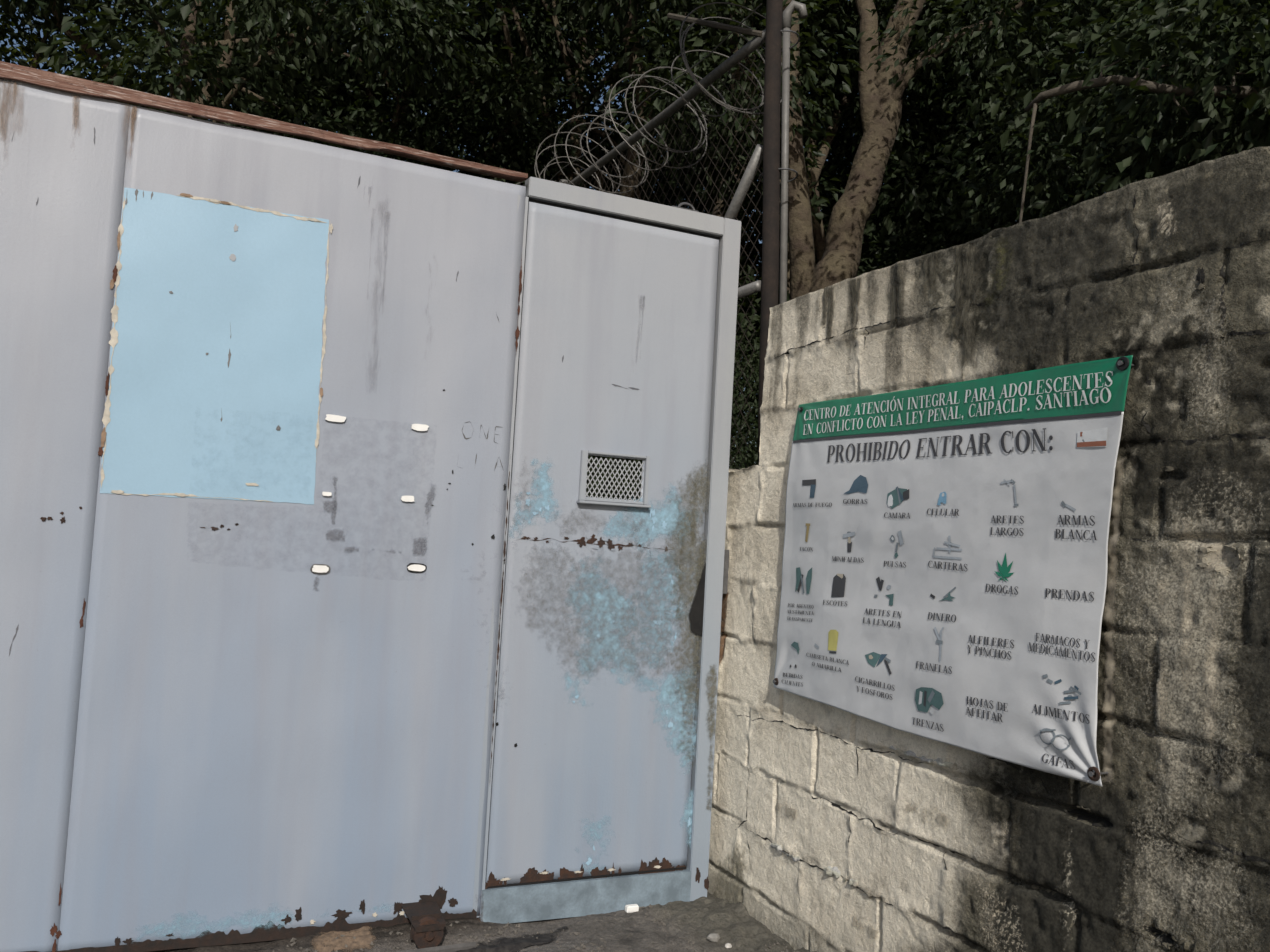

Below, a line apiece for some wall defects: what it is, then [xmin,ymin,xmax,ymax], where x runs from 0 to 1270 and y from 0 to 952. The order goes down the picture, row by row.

leakage [821,288,835,344]
leakage [849,278,860,375]
leakage [890,262,904,337]
leakage [954,195,1129,379]
peeling [604,490,690,546]
corrosion [490,469,683,772]
leakage [973,300,1270,952]
corrosion [23,900,410,952]
corrosion [419,886,477,919]
corrosion [485,862,622,889]
corrosion [639,857,686,874]